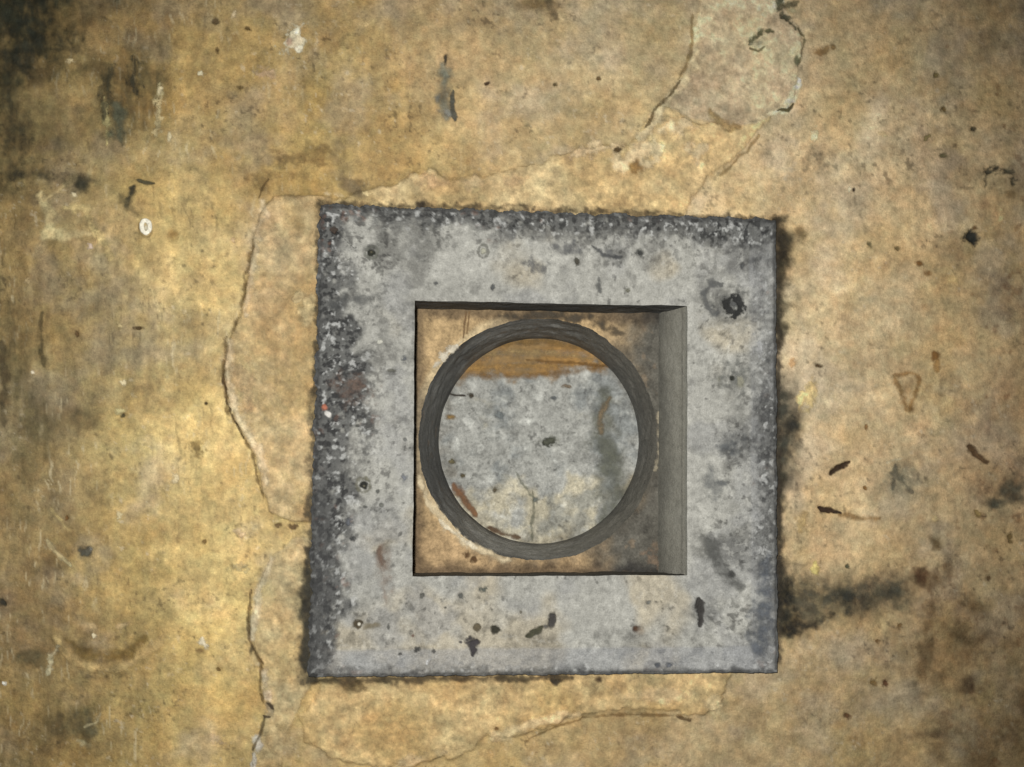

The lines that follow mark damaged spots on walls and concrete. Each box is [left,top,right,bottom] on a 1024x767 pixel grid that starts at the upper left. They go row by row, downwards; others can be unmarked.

crack [795,28,805,65]
crack [645,16,693,127]
crack [777,103,794,112]
crack [720,135,760,176]
crack [222,246,263,495]
corrosion [460,339,606,378]
corrosion [452,483,478,517]
leakage [776,467,823,638]
crack [247,590,265,750]
crack [656,713,691,721]